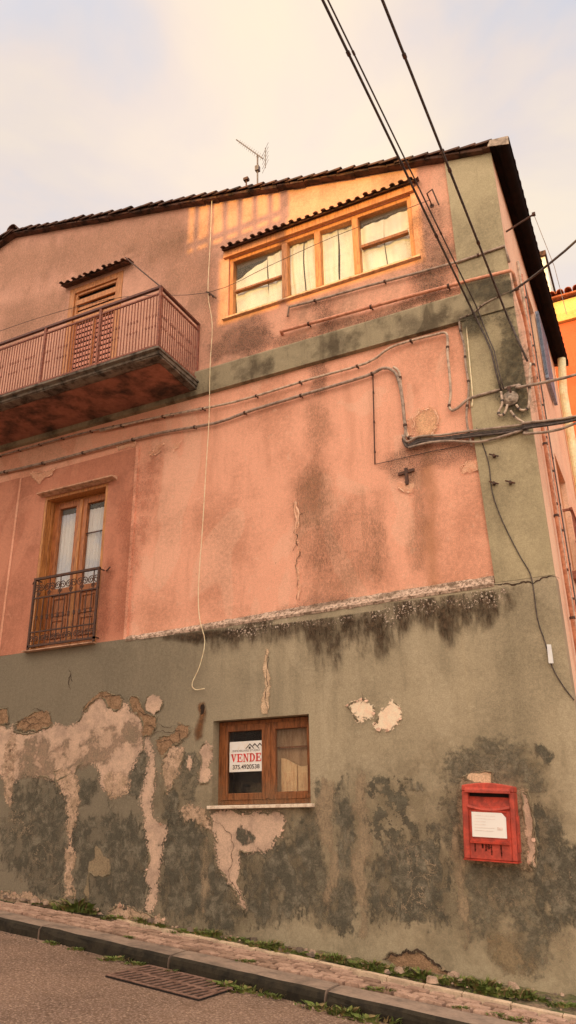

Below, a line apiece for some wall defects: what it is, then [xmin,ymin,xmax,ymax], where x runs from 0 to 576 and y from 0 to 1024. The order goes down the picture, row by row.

spalling [406,407,439,437]
water stain [163,579,511,714]
spalling [0,691,214,807]
spalling [345,694,402,732]
spalling [179,803,287,910]
water stain [0,733,576,979]
flaking render [520,789,539,870]
spalling [0,890,75,914]
spalling [383,948,450,975]